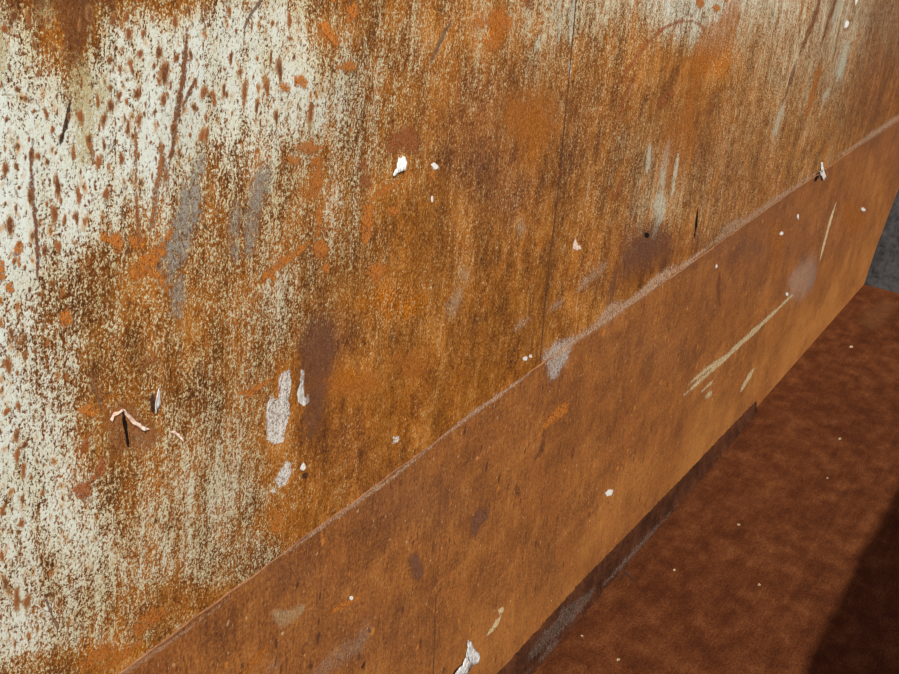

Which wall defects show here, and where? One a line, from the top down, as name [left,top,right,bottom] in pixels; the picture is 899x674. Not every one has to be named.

rust [0,260,15,293]
rust [14,139,41,278]
spalling [4,186,62,298]
spalling [2,145,90,227]
rust [59,101,71,144]
rust [100,27,196,292]
spalling [77,4,297,175]
rust [280,75,308,92]
peeling [393,156,407,177]
rust [73,372,160,499]
peeling [266,369,309,444]
peeling [455,640,480,674]